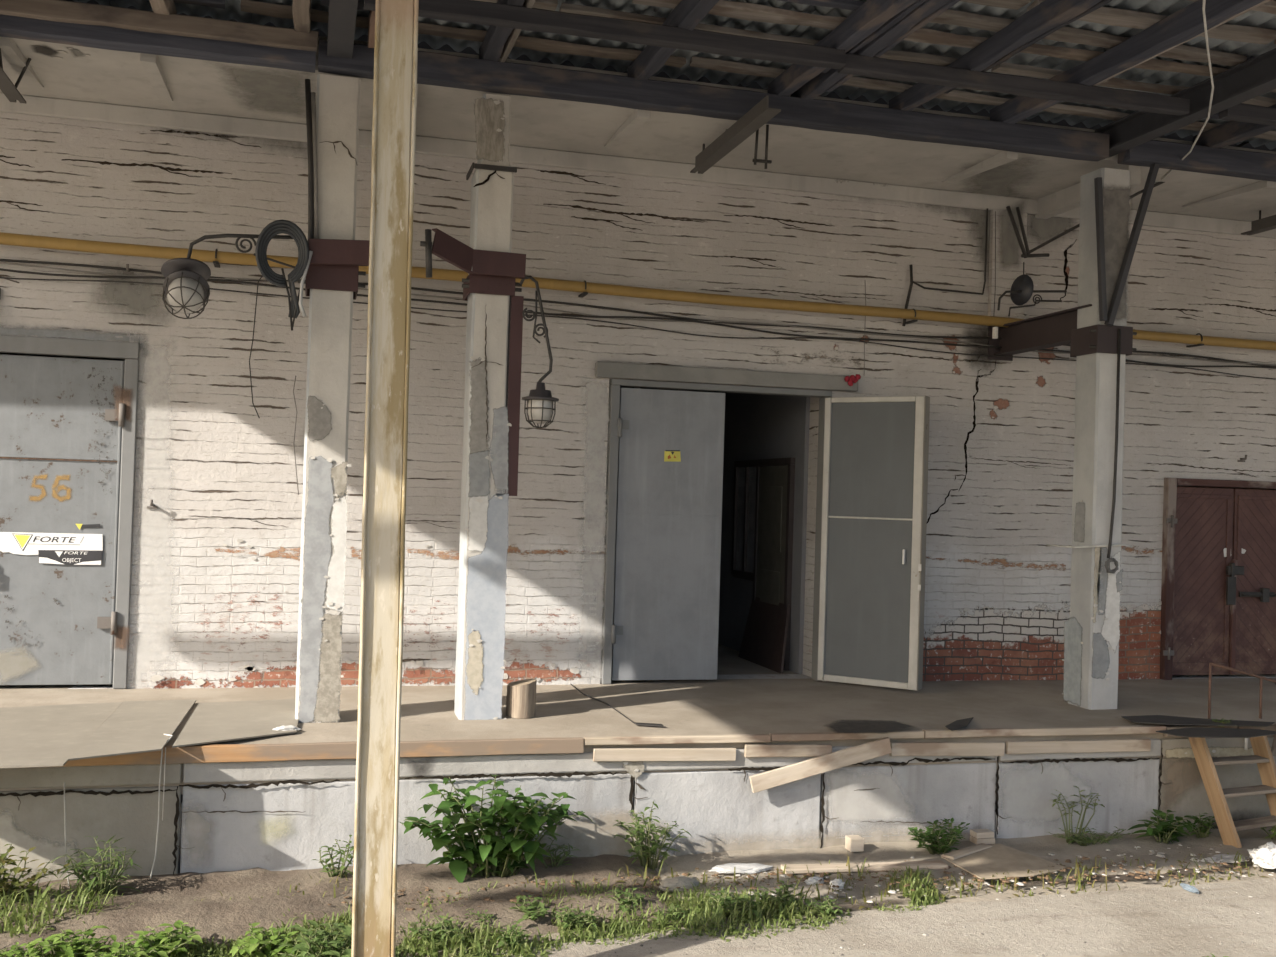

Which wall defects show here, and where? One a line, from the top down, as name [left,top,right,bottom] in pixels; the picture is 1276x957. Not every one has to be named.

crack [1060,240,1077,300]
spalling [939,334,962,375]
spalling [1033,347,1056,387]
spalling [307,396,337,441]
crack [876,352,1065,523]
spalling [990,398,1014,423]
peeling [402,356,605,720]
peeling [151,456,362,723]
peeling [923,500,1162,706]